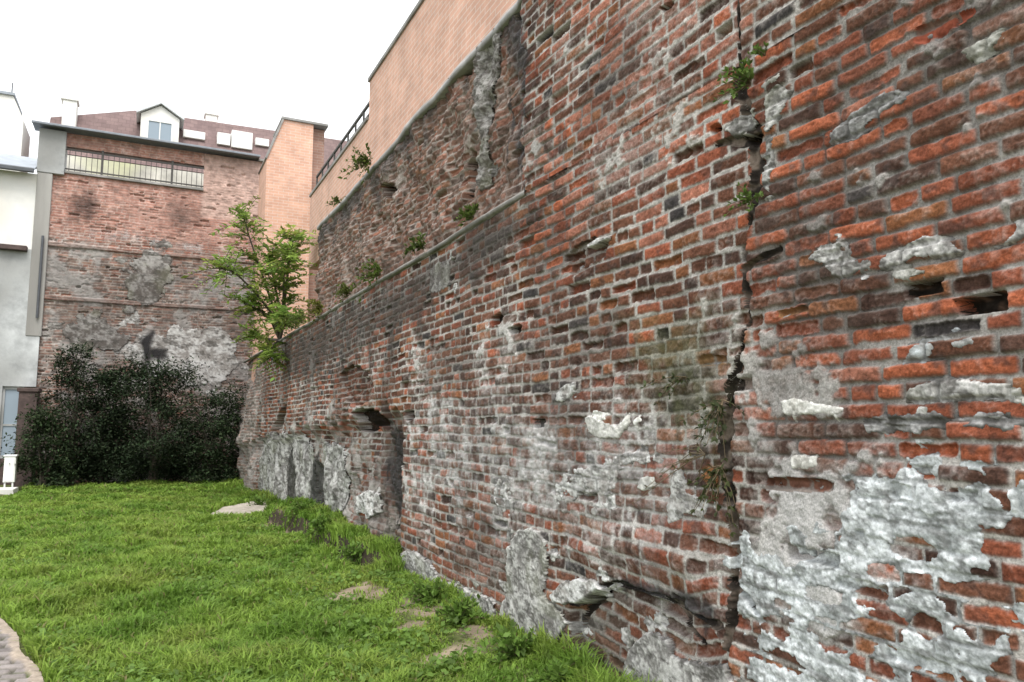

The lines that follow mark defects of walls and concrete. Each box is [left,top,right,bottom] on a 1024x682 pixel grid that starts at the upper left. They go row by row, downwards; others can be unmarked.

peeling [893,90,911,105]
crack [715,0,766,227]
spalling [861,262,944,298]
spalling [955,290,1009,316]
peeling [117,311,157,330]
spalling [341,365,391,432]
crack [569,245,783,659]
peeling [546,548,560,562]
peeling [722,439,1024,682]
peeling [596,567,625,592]
peeling [568,621,593,639]